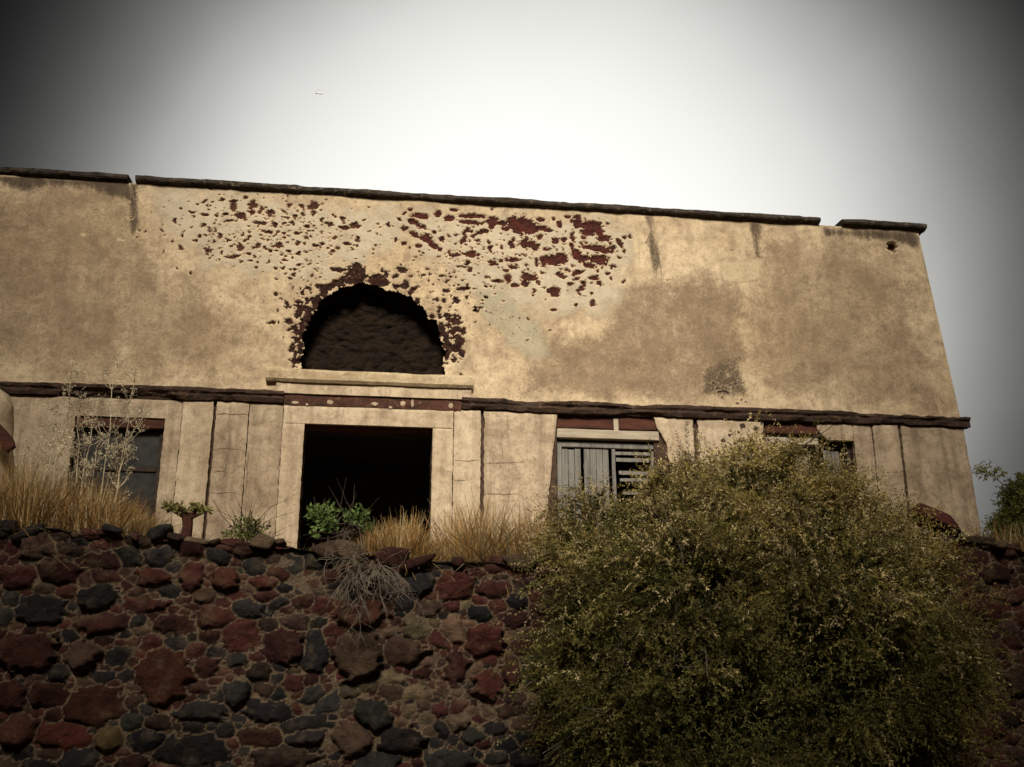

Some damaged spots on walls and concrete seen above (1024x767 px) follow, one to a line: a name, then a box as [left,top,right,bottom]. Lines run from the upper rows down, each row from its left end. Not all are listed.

leakage [0,176,137,231]
flaking render [151,189,633,375]
leakage [535,282,747,404]